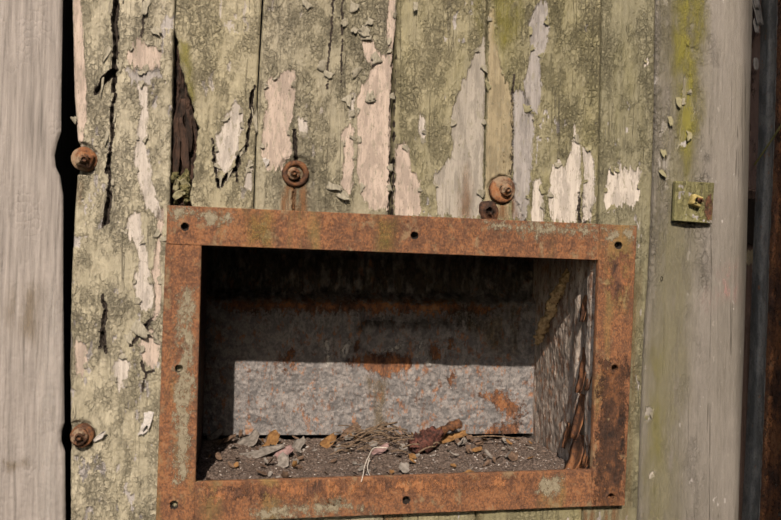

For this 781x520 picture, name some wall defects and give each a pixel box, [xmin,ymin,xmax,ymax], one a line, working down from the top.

crack [138,0,146,38]
crack [98,294,108,354]
crack [94,0,123,228]
peeling [121,26,166,370]
crack [129,314,159,392]
peeling [244,69,309,191]
peeling [326,0,423,216]
rust [342,338,412,380]
rust [473,386,526,434]
peeling [433,0,641,223]
rust [561,347,631,520]
rust [759,0,781,520]